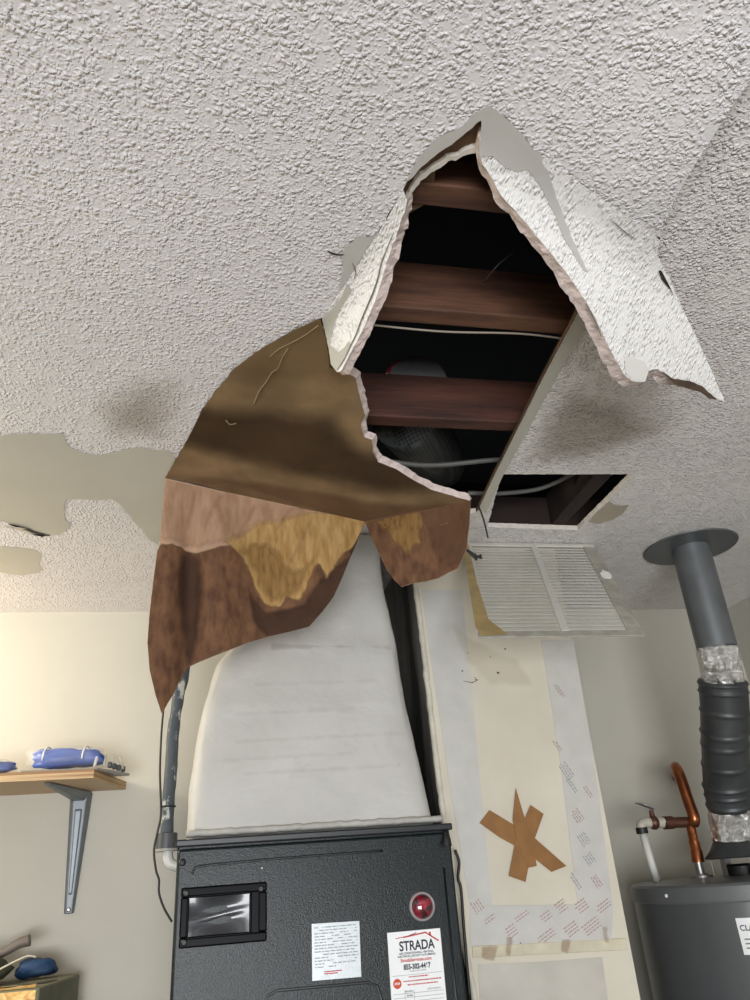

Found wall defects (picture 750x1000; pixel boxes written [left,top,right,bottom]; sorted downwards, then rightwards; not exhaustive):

spalling [339,126,682,501]
damp [186,410,425,489]
damp [147,479,471,713]